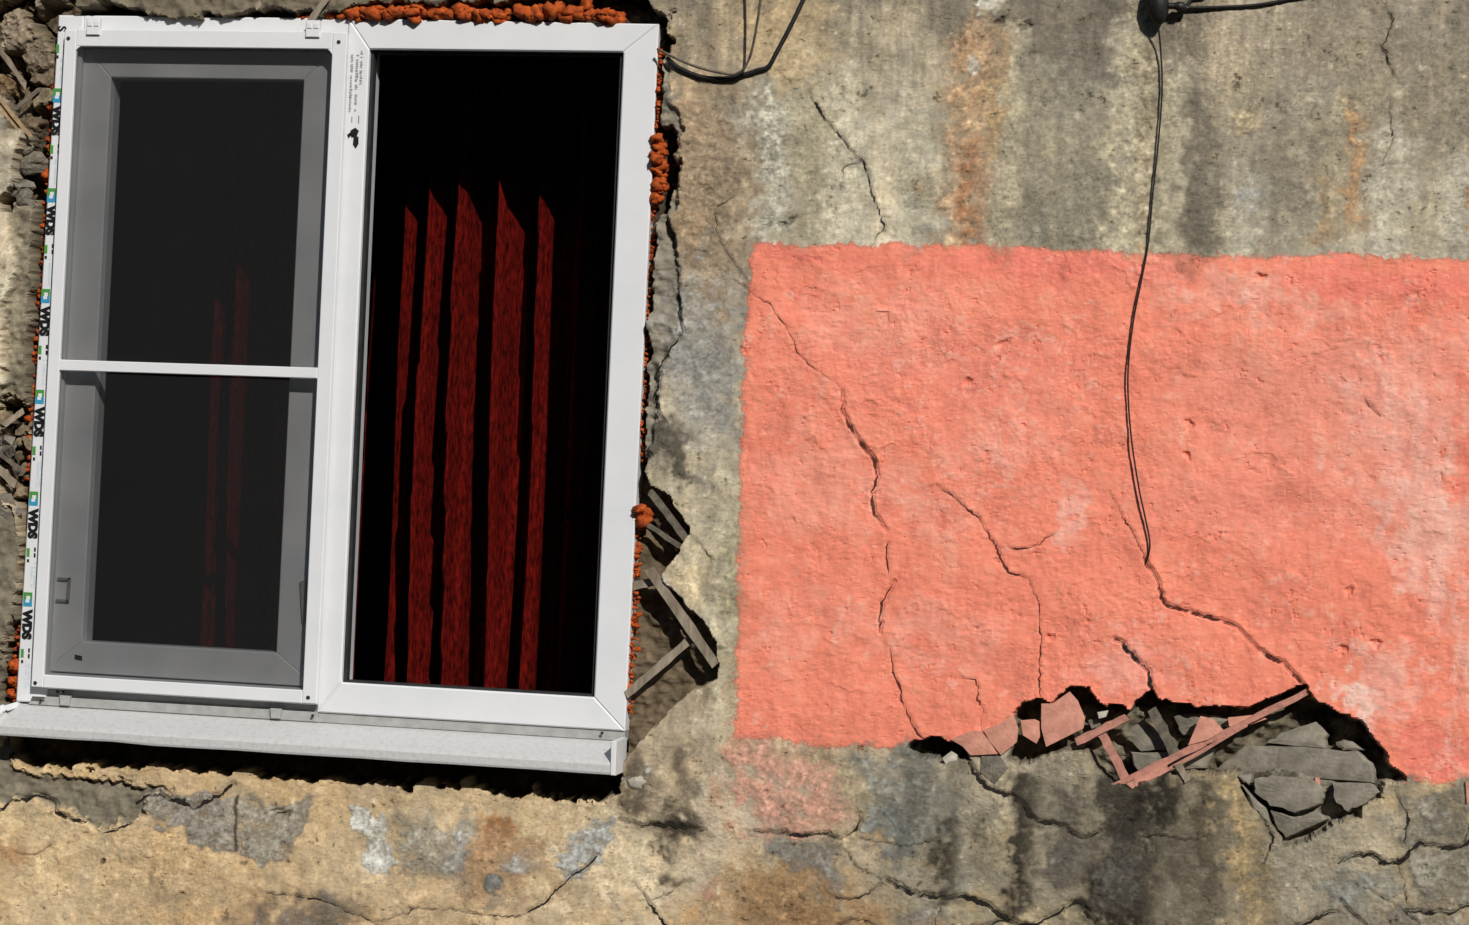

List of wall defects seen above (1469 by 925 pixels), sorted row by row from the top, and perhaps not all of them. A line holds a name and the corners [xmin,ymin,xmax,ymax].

flaking render [745,81,794,234]
flaking render [0,0,90,569]
spalling [621,40,737,790]
crack [715,197,923,738]
crack [1111,495,1305,691]
crack [0,784,233,855]
flaking render [554,815,616,880]
crack [754,816,1097,925]
damp [1002,776,1064,919]
spalling [724,684,1469,925]
damp [1077,762,1205,925]
crack [1302,789,1469,925]